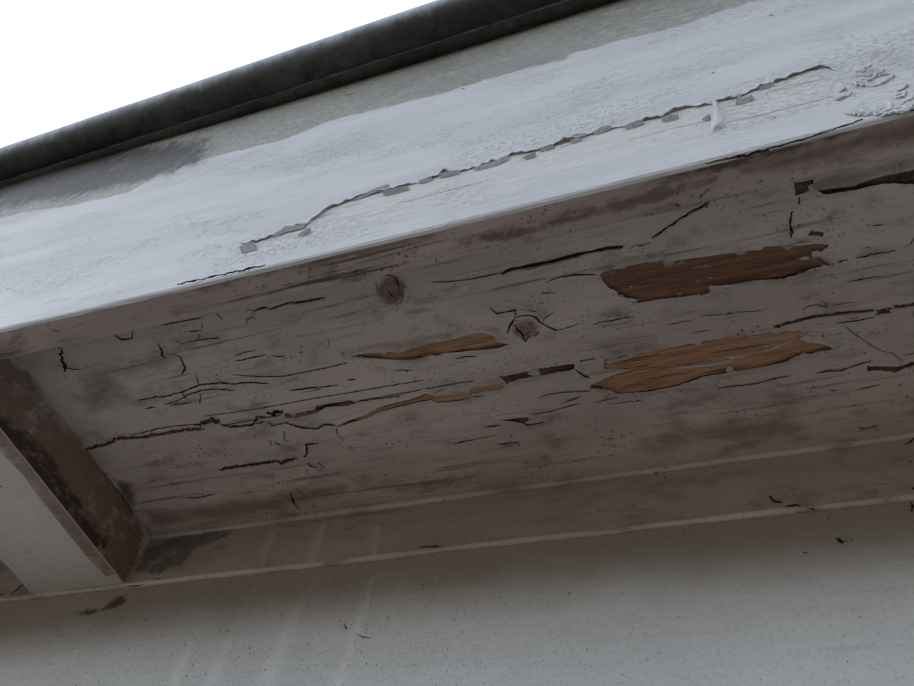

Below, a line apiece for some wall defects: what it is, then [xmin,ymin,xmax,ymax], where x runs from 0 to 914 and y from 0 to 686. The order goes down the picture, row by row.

peeling [239,62,847,255]
crack [57,347,82,372]
water stain [69,323,243,428]
crack [177,265,266,285]
crack [83,314,442,511]
crack [246,292,327,324]
peeling [281,322,844,440]
crack [431,202,714,342]
water stain [618,401,828,461]
peeling [549,158,914,308]
crack [668,238,914,362]
water stain [0,356,365,686]